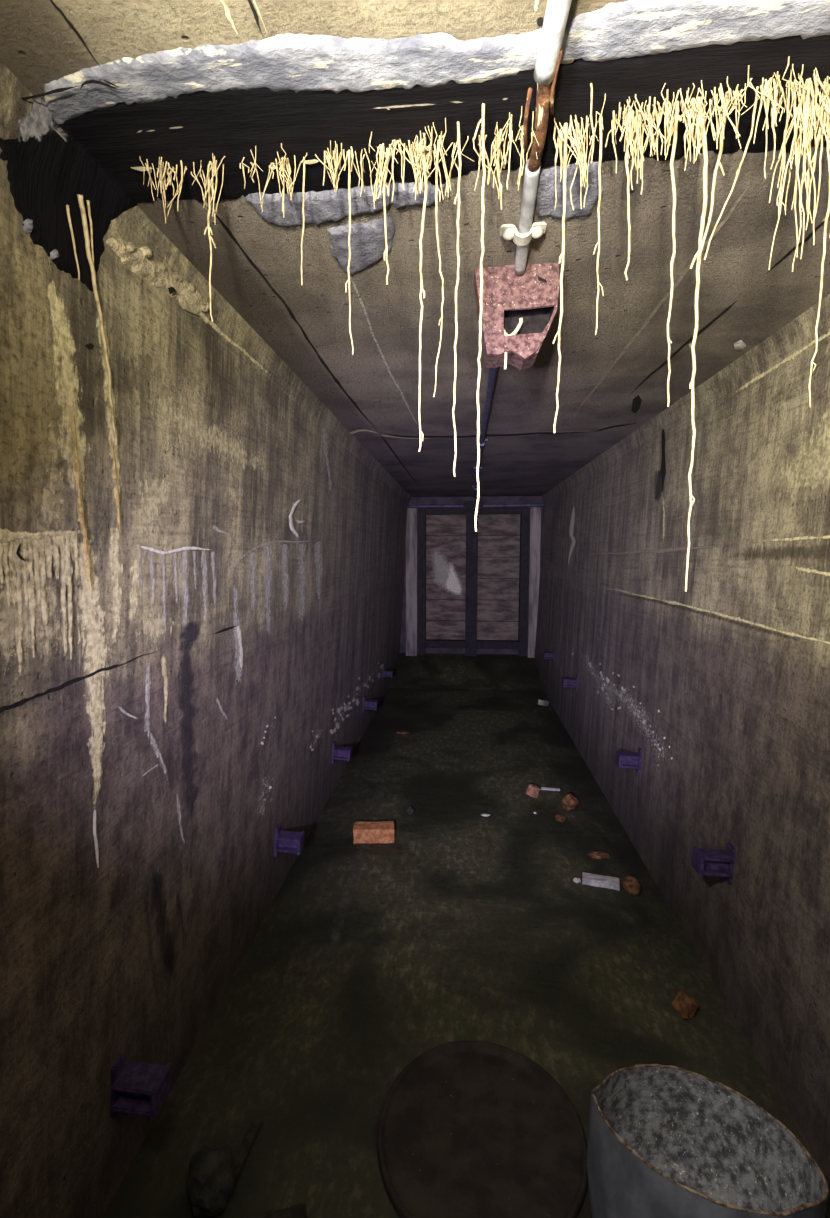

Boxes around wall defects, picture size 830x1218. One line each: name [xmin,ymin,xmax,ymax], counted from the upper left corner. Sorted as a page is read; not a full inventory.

crack [21,0,118,100]
corrosion [523,49,563,172]
peeling [245,182,446,276]
peeling [535,161,605,221]
damp [146,395,266,470]
damp [773,411,830,496]
damp [0,280,216,868]
damp [231,540,323,681]
damp [791,566,830,576]
crack [0,648,163,713]